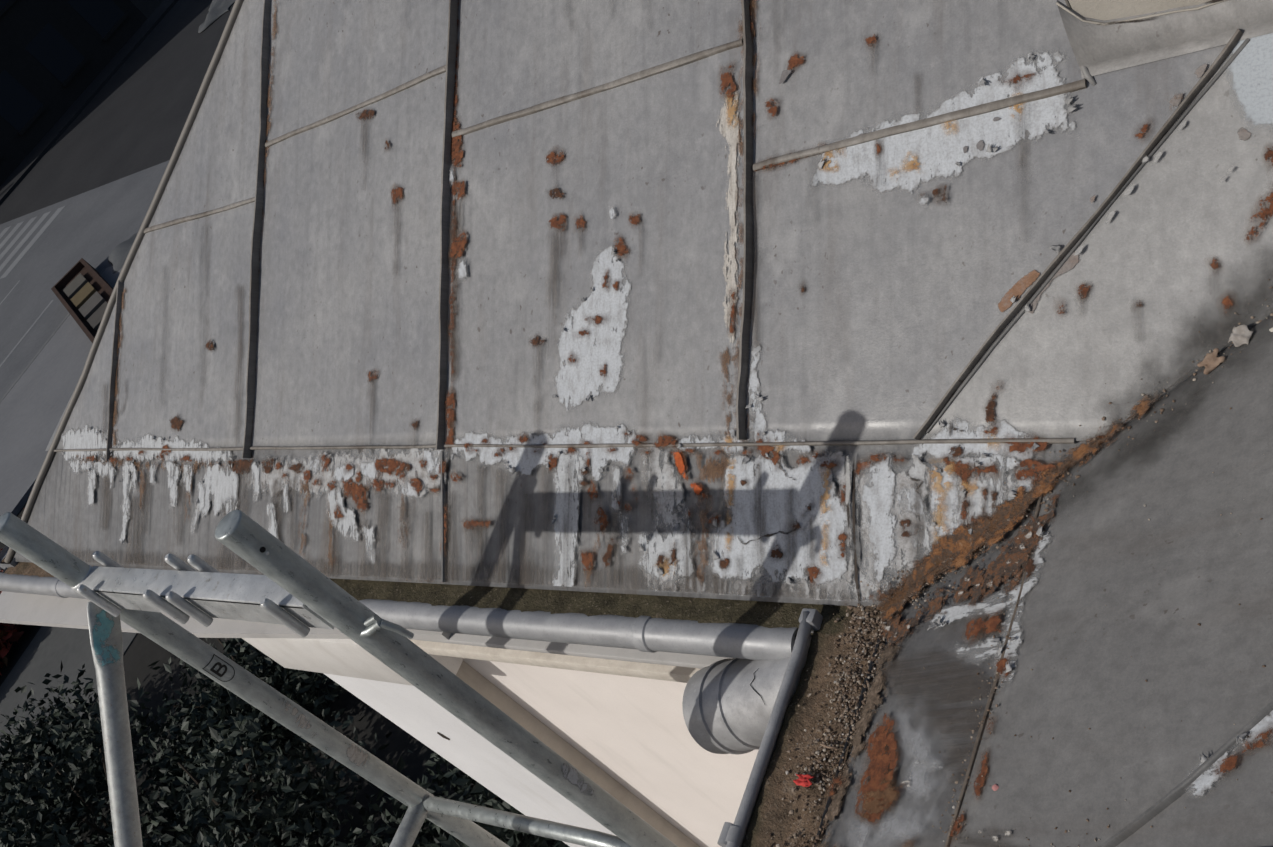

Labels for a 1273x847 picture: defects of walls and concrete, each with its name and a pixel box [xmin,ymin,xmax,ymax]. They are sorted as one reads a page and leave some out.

corrosion [739,0,808,197]
peeling [809,49,1077,194]
peeling [1227,33,1273,141]
corrosion [549,188,586,231]
corrosion [75,43,477,566]
peeling [61,345,1047,602]
peeling [551,245,631,412]
corrosion [632,337,751,582]
corrosion [985,386,1000,426]
damp [1110,382,1203,468]
damp [1180,273,1273,376]
peeling [927,525,1051,681]